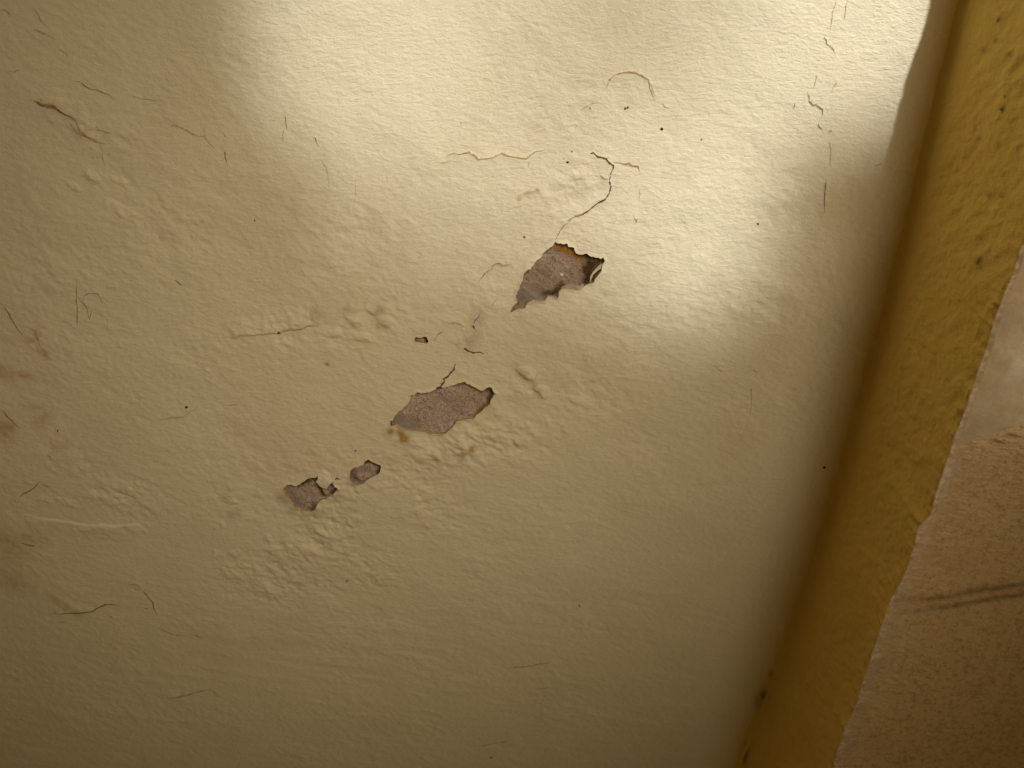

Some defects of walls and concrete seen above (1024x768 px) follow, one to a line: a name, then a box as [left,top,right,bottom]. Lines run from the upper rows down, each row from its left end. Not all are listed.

crack [580,71,669,111]
crack [442,149,551,166]
crack [555,152,640,240]
peeling [507,238,608,315]
peeling [387,378,499,437]
peeling [280,457,384,514]